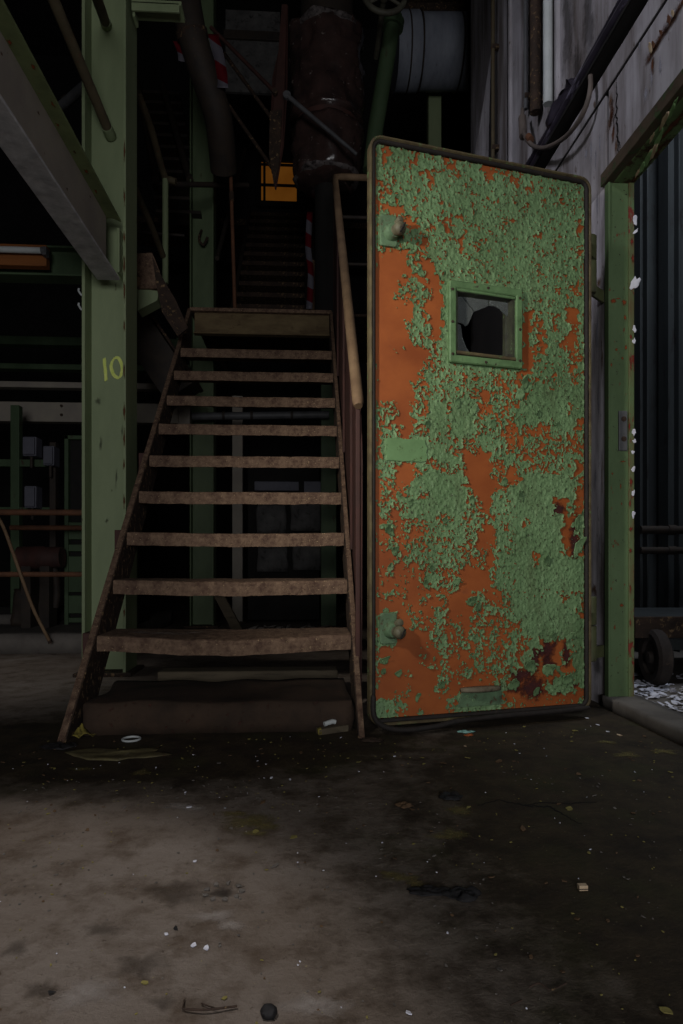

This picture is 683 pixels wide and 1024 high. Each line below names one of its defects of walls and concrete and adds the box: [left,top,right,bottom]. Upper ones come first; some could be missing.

peeling [376,144,587,718]
rust [569,516,579,558]
rust [510,641,578,698]